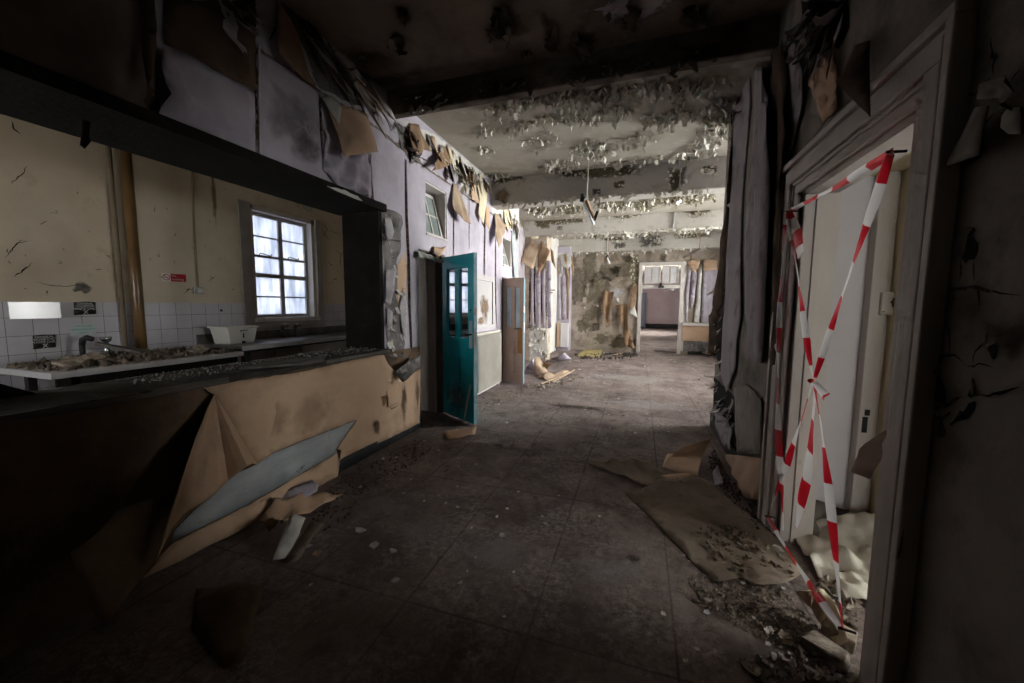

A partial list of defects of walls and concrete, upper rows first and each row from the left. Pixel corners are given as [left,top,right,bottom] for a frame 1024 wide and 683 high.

flaking render [946,105,990,166]
crack [5,241,85,288]
peeling [394,0,871,500]
crack [939,262,1020,367]
peeling [142,209,447,579]